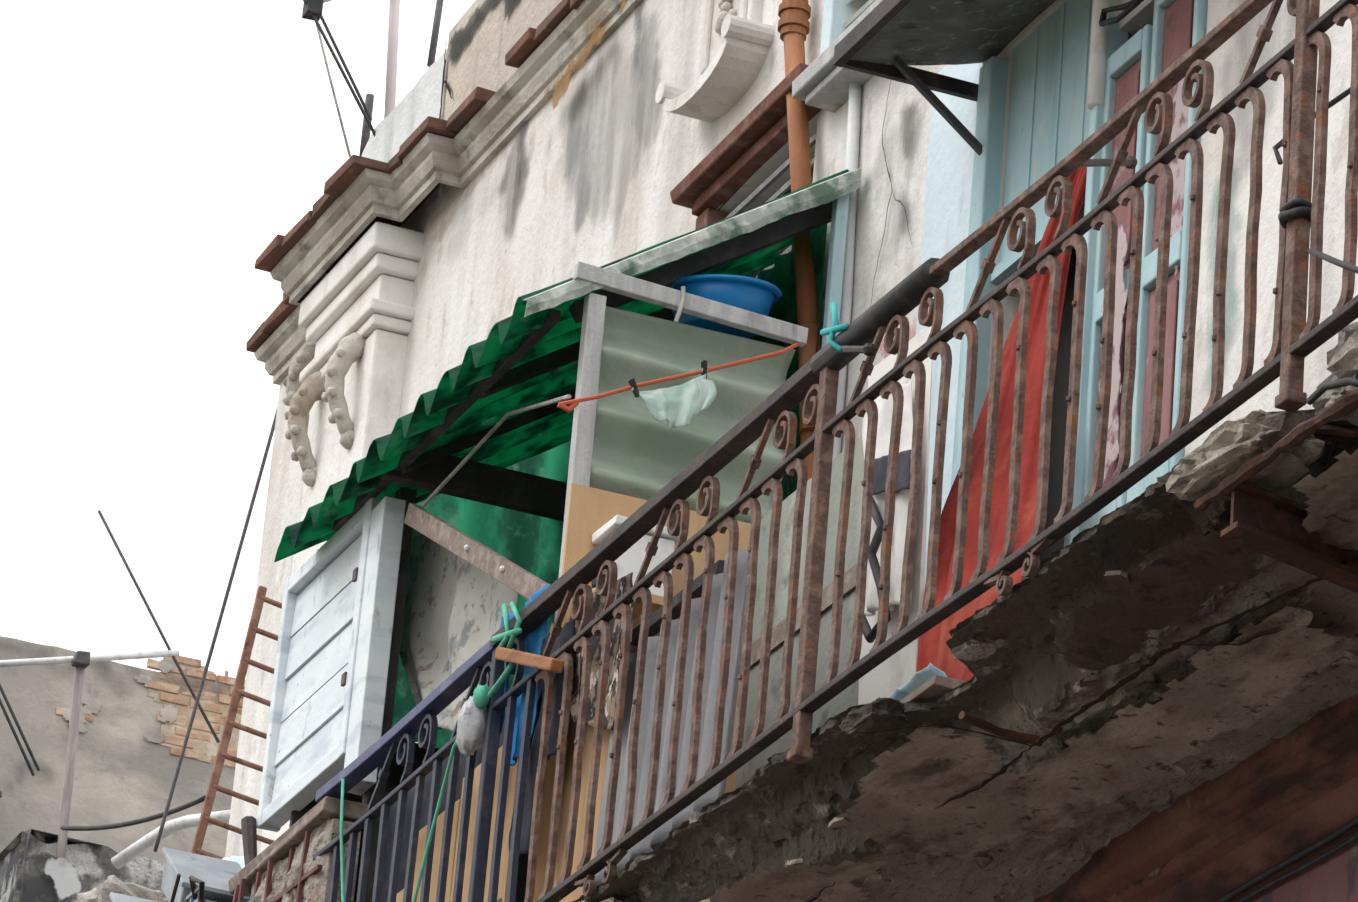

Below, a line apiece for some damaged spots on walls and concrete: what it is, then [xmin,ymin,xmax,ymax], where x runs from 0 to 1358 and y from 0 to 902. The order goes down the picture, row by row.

damp [448,0,518,64]
damp [500,121,527,232]
peeling [1102,570,1131,589]
peeling [1302,515,1328,533]
flaking render [135,656,246,768]
flaking render [699,606,1358,902]
crack [856,550,1358,809]